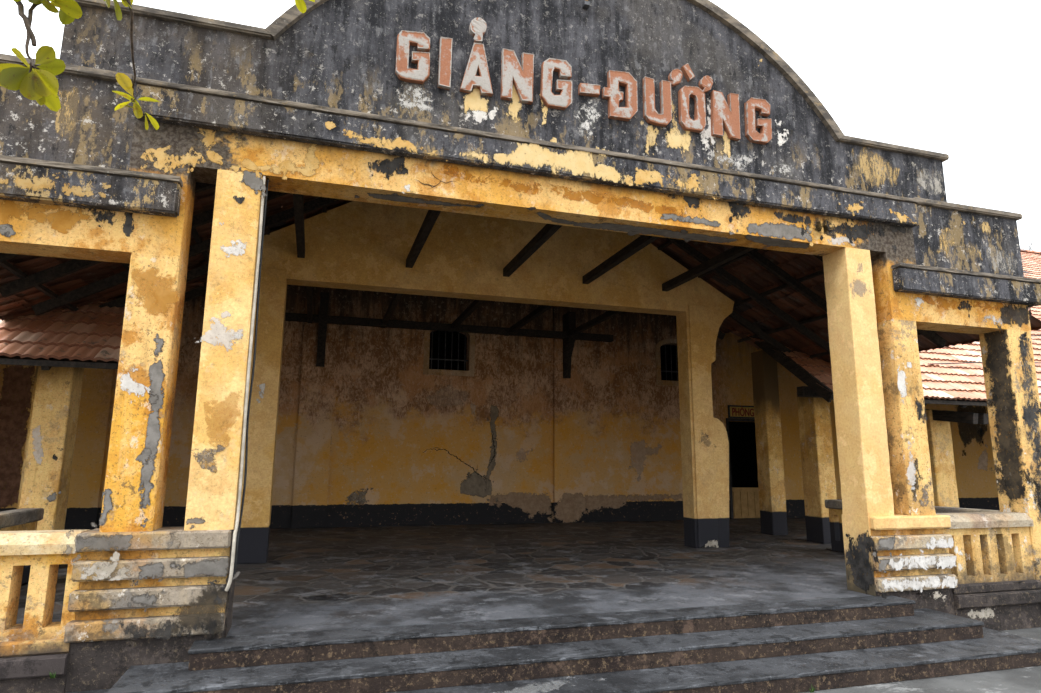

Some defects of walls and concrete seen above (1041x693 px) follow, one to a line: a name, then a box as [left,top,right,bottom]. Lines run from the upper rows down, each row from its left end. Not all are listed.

damp [462,107,498,123]
damp [641,96,752,169]
damp [368,156,410,180]
peeling [459,137,716,200]
damp [774,211,906,255]
peeling [195,311,243,352]
flaking render [120,333,165,528]
spalling [194,444,225,474]
crack [423,405,499,501]
damp [956,303,1041,521]
flaking render [62,488,133,562]
peeling [460,471,683,523]